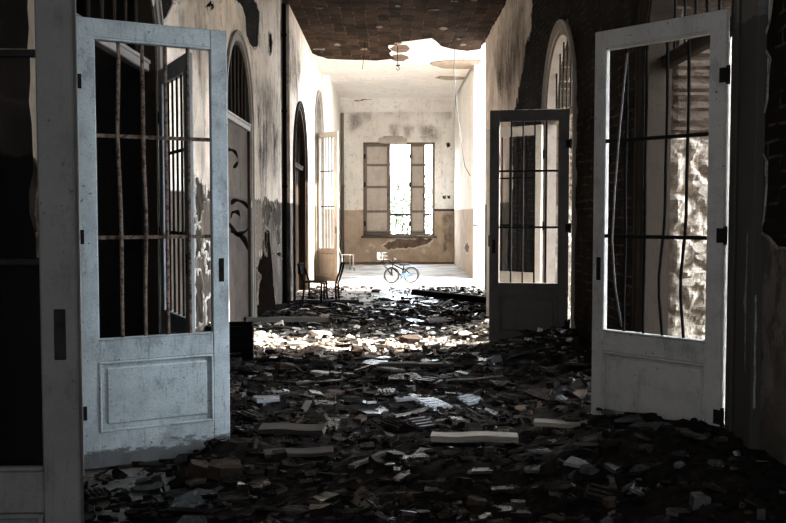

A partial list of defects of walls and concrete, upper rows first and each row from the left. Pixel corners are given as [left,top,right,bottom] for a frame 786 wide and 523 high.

peeling [152,0,189,23]
spalling [205,0,223,15]
peeling [234,0,273,56]
peeling [281,0,507,80]
peeling [194,175,211,329]
spalling [251,196,284,317]
spalling [366,235,434,254]
peeling [507,121,541,273]
peeling [514,0,639,341]
peeling [762,0,786,251]